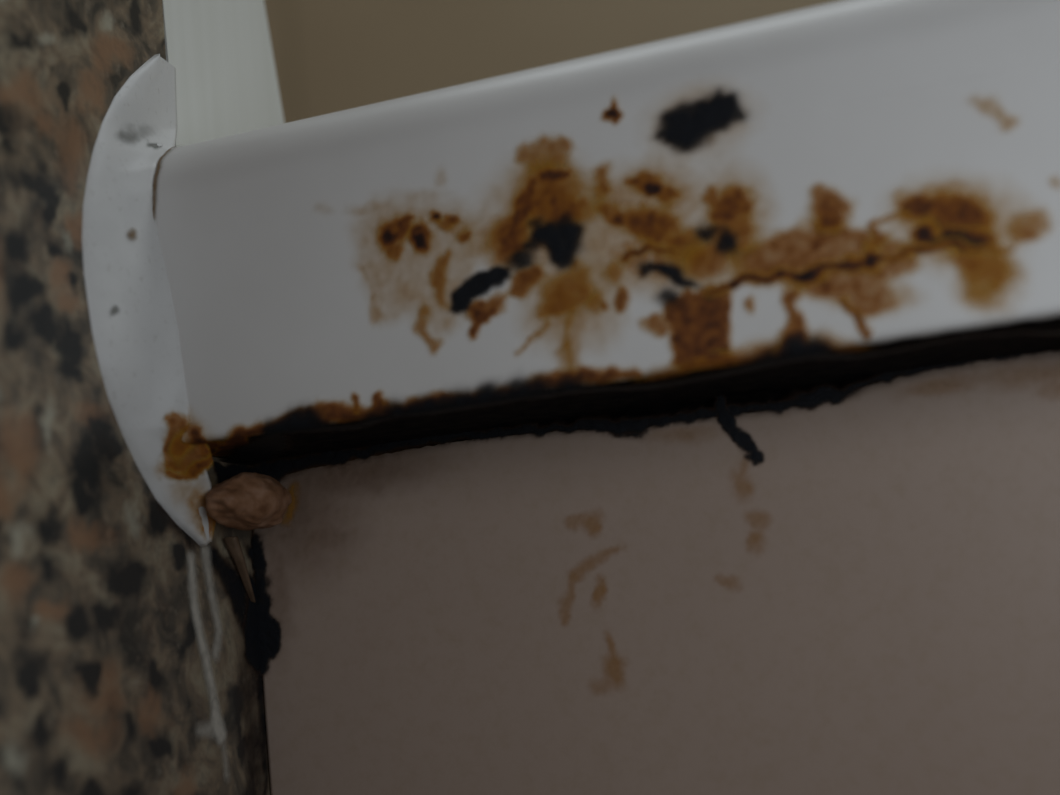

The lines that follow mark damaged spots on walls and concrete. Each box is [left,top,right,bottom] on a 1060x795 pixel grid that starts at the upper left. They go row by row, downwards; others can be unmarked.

corrosion [602,100,623,124]
peeling [655,90,746,152]
corrosion [377,137,780,385]
corrosion [897,184,1049,300]
crack [211,184,1060,483]
corrosion [816,336,869,353]
corrosion [163,391,391,480]
corrosion [189,492,216,535]